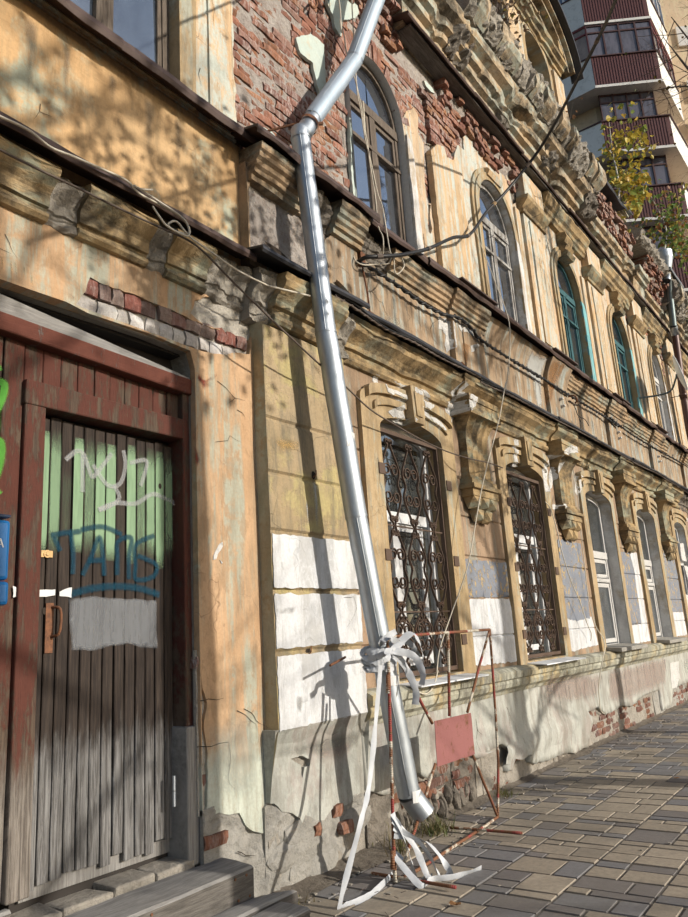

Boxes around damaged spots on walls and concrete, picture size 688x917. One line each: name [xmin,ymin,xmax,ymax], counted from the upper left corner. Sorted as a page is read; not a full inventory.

flaking render [232,0,360,148]
flaking render [311,89,350,192]
flaking render [366,32,462,204]
spalling [77,279,250,354]
spalling [190,650,572,898]
spalling [589,661,688,746]